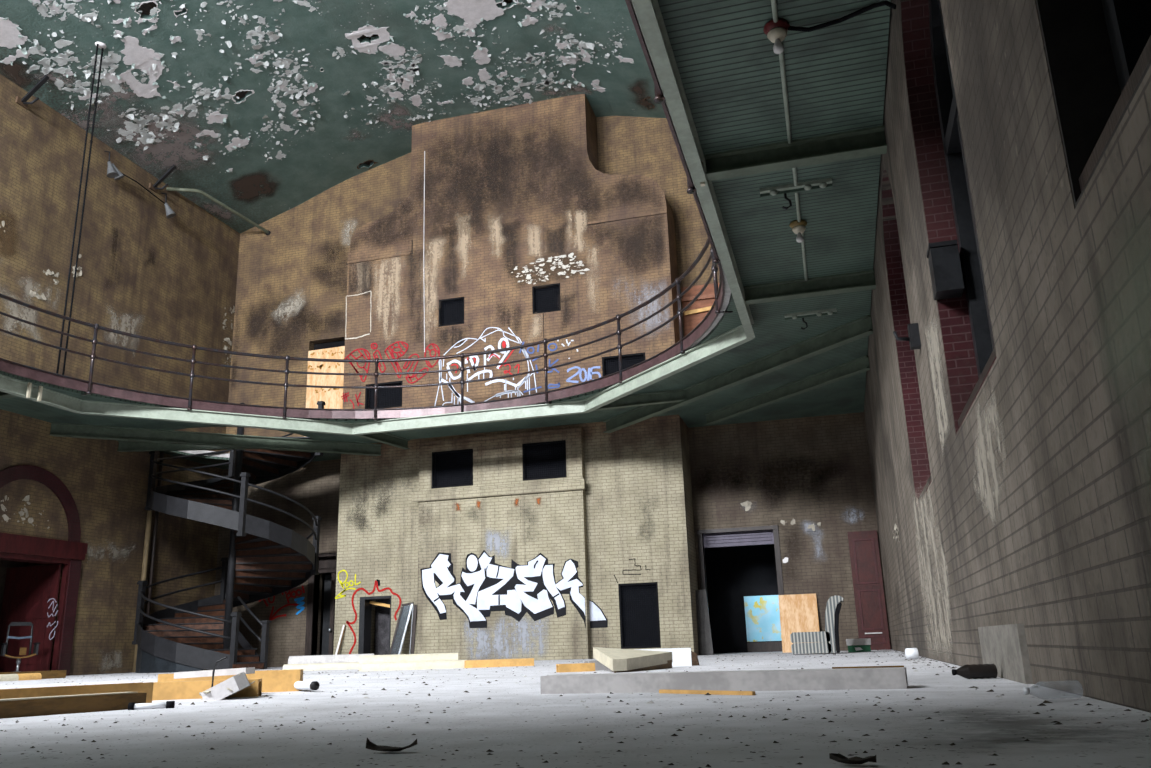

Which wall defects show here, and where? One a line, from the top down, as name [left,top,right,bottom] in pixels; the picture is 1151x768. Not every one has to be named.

peeling [326,0,634,129]
flaking render [0,0,324,202]
damp [491,212,596,267]
damp [276,295,302,316]
damp [357,217,470,346]
spalling [509,253,589,284]
damp [639,291,668,325]
peeling [1,495,50,529]